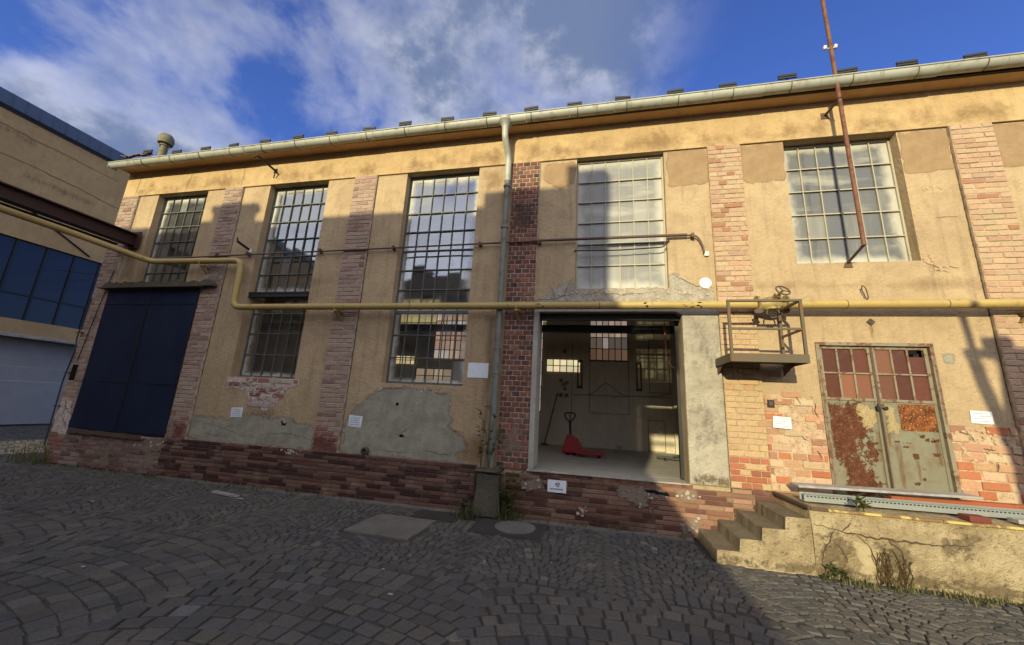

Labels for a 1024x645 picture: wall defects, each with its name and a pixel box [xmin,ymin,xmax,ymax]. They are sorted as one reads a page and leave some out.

peeling [535,273,716,308]
spalling [225,376,300,426]
corrosion [828,396,887,498]
corrosion [894,404,941,486]
spalling [949,425,1024,504]
spalling [613,482,704,536]
crack [815,523,974,571]